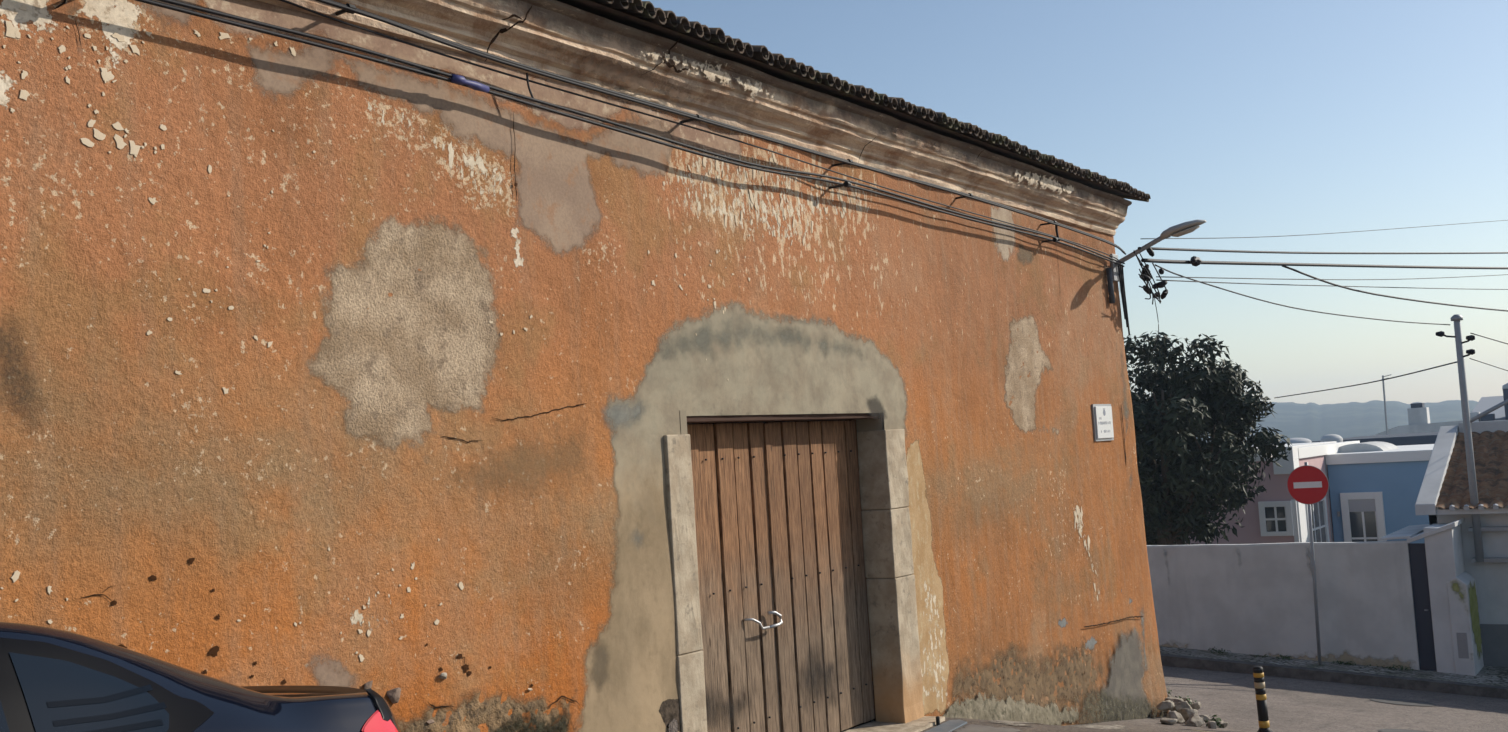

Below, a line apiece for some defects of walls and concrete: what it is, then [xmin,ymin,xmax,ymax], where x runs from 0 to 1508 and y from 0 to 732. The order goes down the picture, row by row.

crack [485,6,532,61]
peeling [0,0,167,157]
peeling [663,146,869,246]
peeling [511,227,524,268]
crack [443,403,587,443]
peeling [906,440,1102,716]
peeling [340,563,417,662]
spalling [439,654,492,679]
spalling [364,680,569,732]
spalling [659,699,681,732]